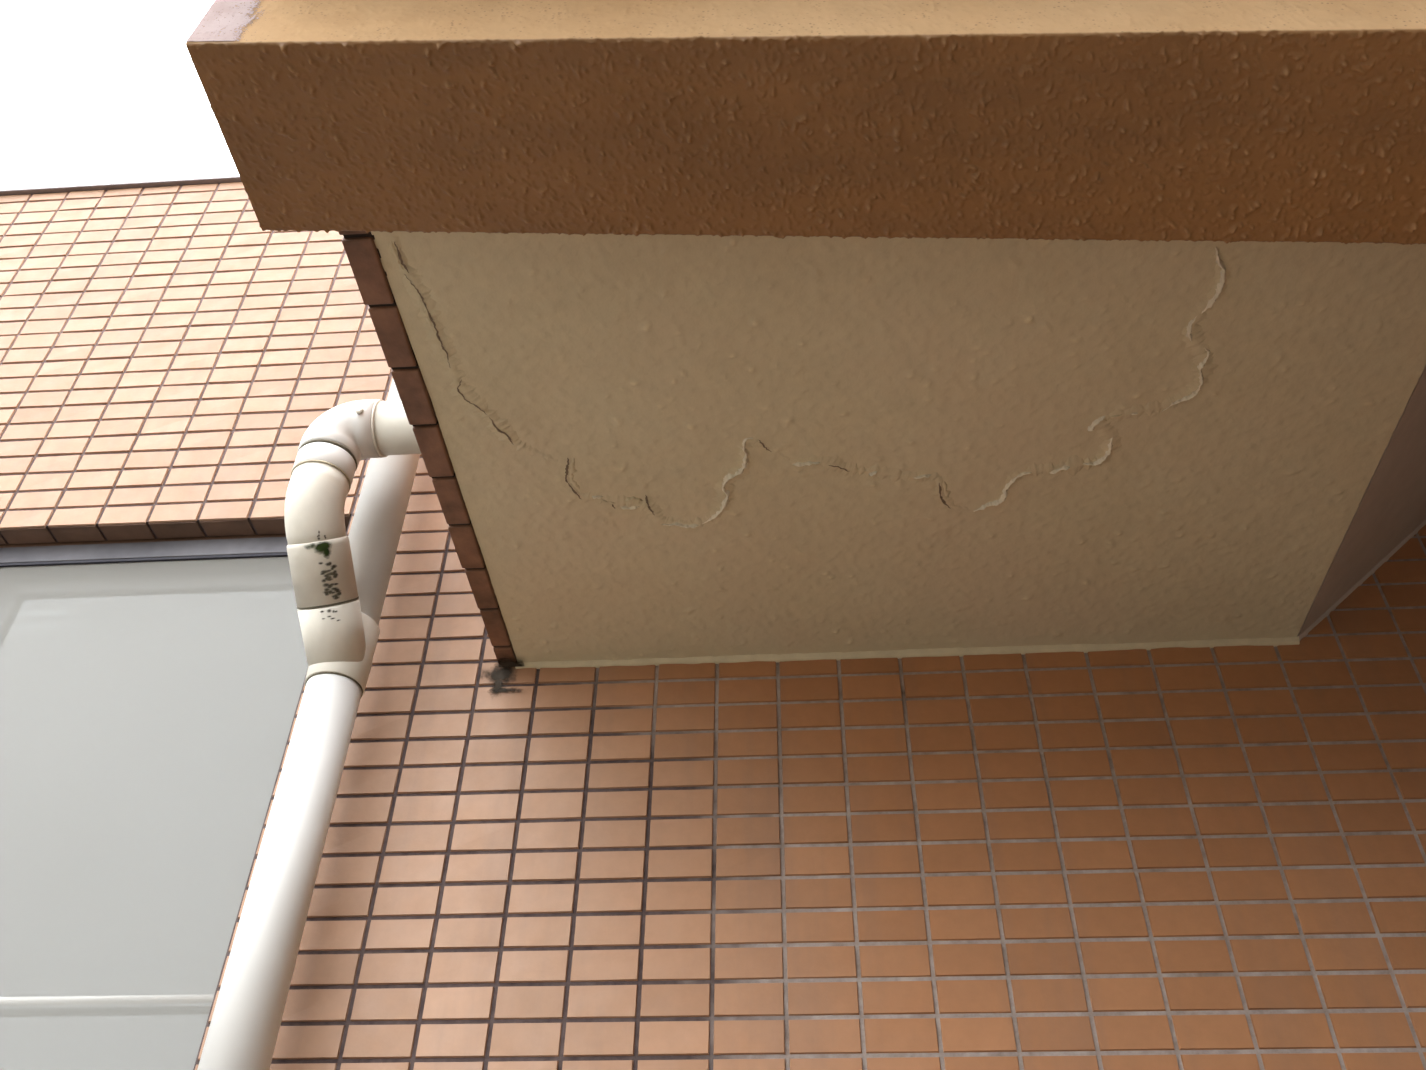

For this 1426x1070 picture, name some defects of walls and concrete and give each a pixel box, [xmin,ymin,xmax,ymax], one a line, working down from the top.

crack [389,236,1228,528]